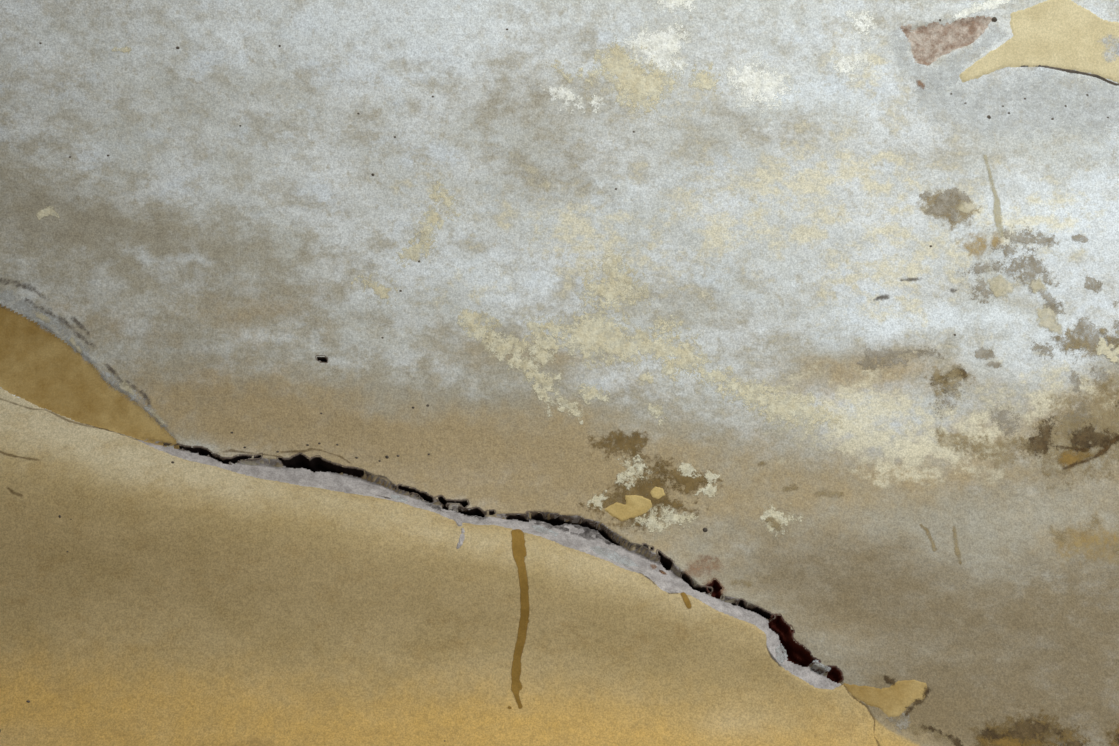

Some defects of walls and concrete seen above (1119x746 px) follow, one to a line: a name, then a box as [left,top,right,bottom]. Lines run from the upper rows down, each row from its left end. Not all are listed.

peeling [894,0,1119,87]
crack [26,407,880,746]
peeling [0,279,929,730]
peeling [456,248,843,433]
leakage [580,431,721,533]
leakage [857,155,1119,485]